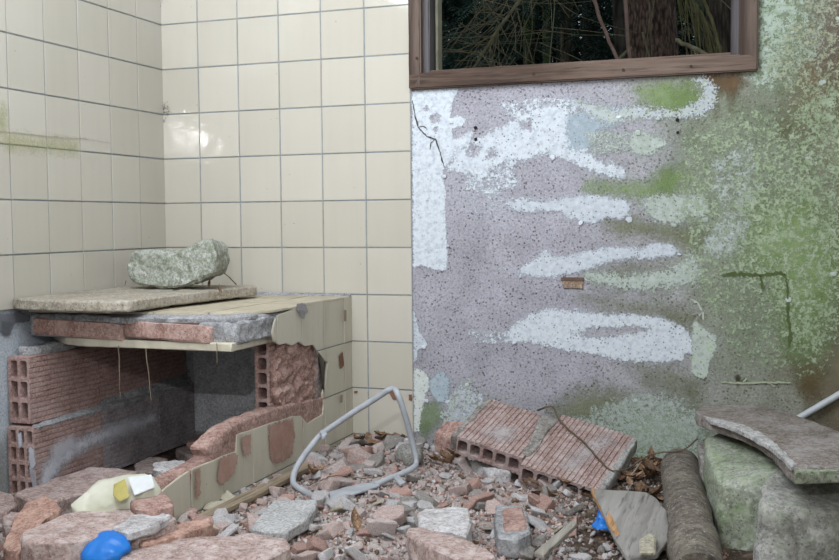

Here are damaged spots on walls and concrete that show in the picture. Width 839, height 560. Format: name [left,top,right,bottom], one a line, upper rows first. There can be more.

leakage [816,0,839,91]
crack [412,100,444,165]
peeling [411,0,839,379]
crack [721,271,792,347]
leakage [798,325,839,431]